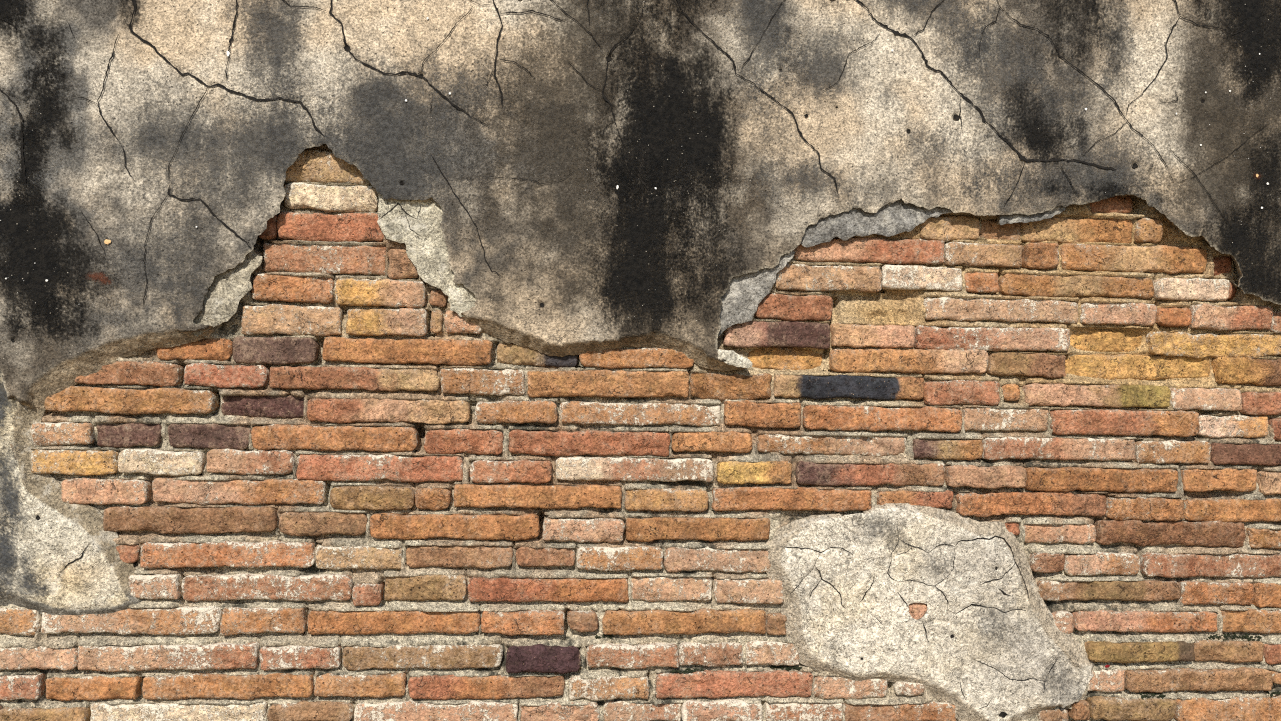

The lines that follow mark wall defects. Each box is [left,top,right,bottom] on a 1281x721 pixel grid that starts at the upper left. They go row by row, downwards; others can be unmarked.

water stain [0,0,118,340]
crack [73,0,324,307]
spalling [192,246,264,337]
water stain [105,0,488,319]
spalling [377,192,476,317]
crack [283,0,648,190]
water stain [485,0,746,342]
spalling [717,198,952,370]
crack [823,0,1273,228]
spalling [1065,330,1281,386]
water stain [1166,0,1281,301]
crack [779,520,1029,642]